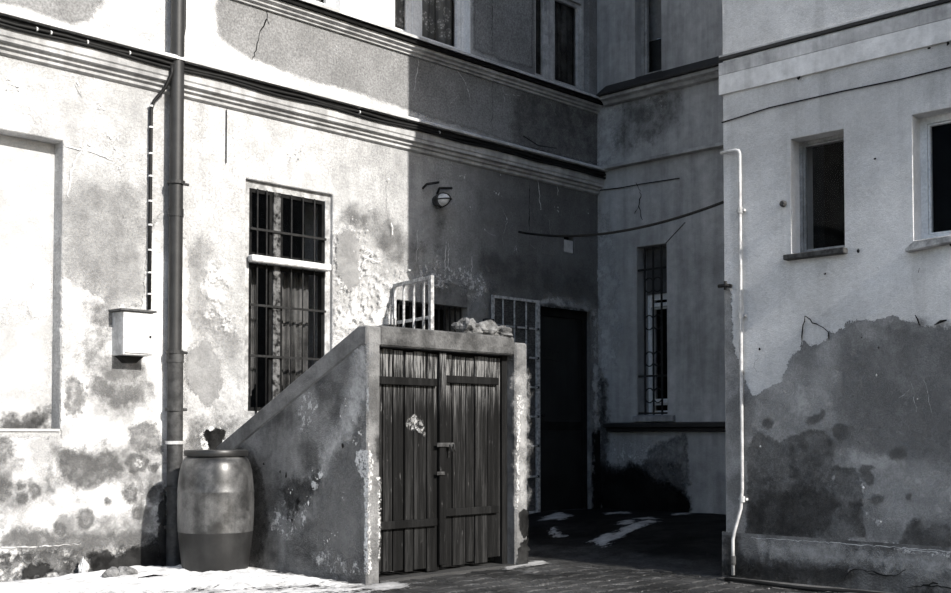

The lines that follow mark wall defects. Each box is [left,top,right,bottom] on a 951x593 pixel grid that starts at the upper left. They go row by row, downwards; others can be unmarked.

leakage [0,280,167,579]
peeling [0,210,169,582]
peeling [182,234,248,459]
flaking render [342,431,382,574]
leakage [335,210,584,333]
leakage [515,376,528,504]
leakage [592,215,692,513]
leakage [721,324,951,586]
peeling [725,287,951,557]